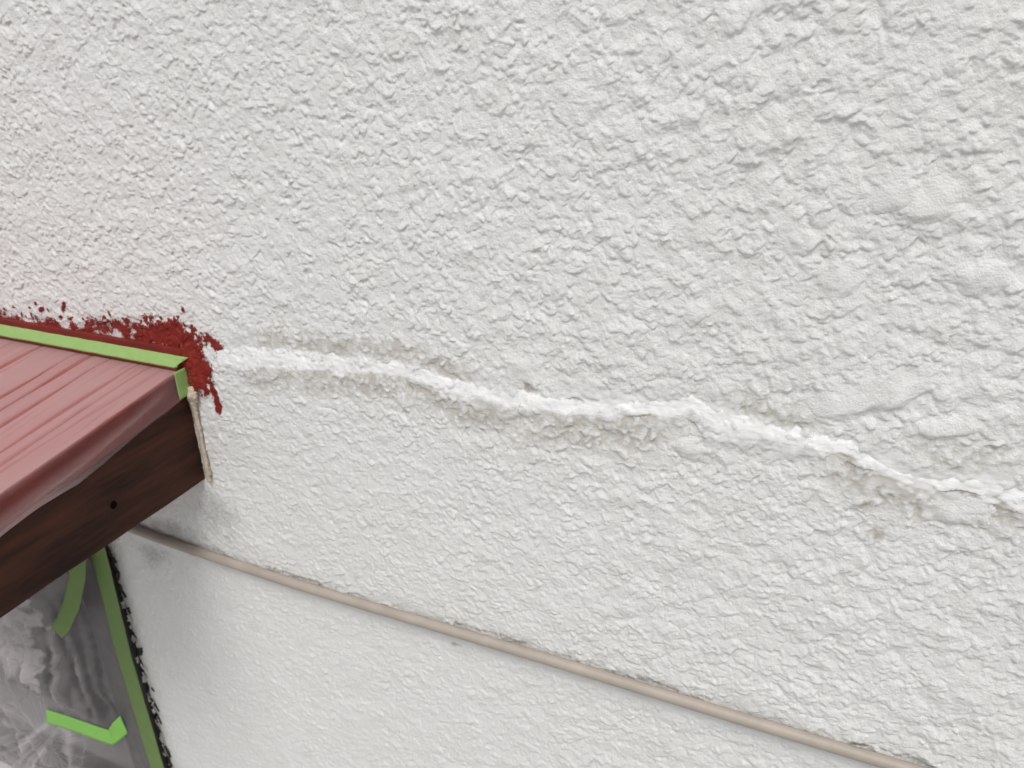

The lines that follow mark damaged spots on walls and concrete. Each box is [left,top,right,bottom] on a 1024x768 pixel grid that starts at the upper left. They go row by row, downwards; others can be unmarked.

crack [216,336,1024,514]